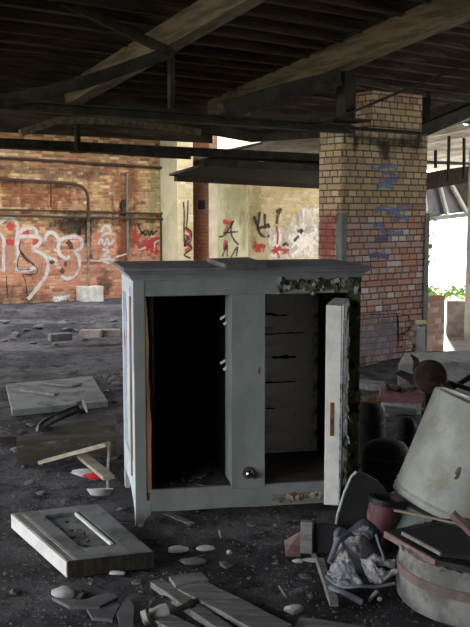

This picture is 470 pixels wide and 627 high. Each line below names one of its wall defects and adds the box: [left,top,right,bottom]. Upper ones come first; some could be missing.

peeling [268,207,319,260]